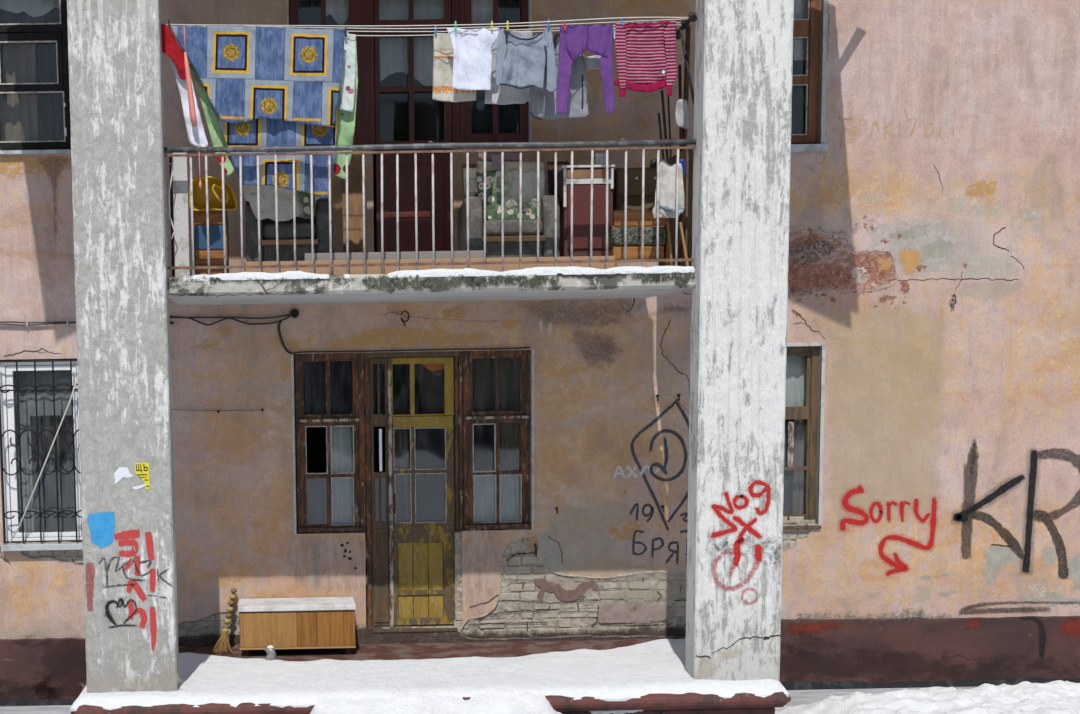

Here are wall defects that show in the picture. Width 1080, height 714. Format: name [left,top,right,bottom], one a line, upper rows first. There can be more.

leakage [0,154,73,261]
flaking render [788,215,910,319]
crack [889,227,1024,290]
leakage [516,298,646,371]
crack [660,320,690,413]
flaking render [454,527,687,640]